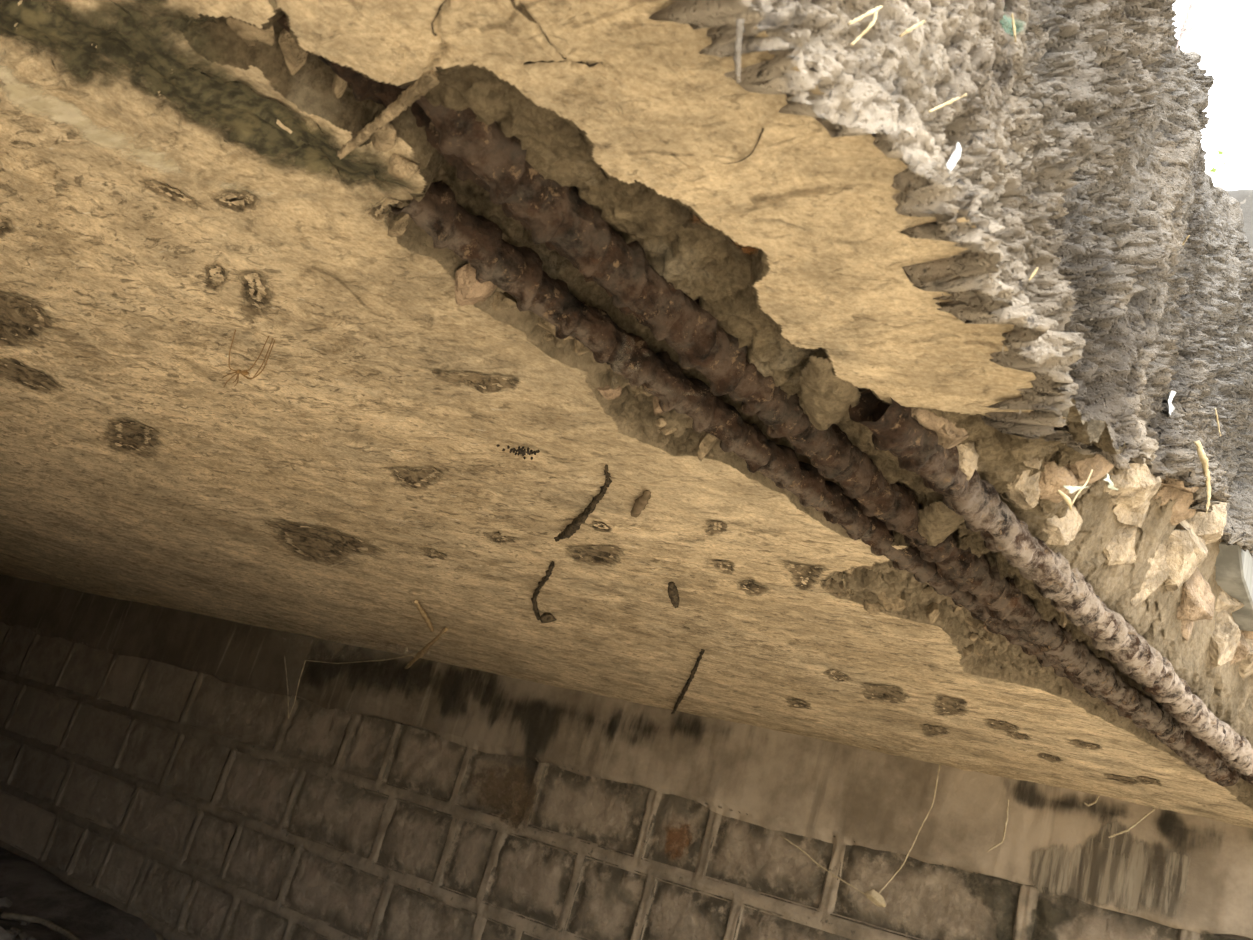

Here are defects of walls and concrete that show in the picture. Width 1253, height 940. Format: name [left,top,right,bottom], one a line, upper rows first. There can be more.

crack [269,0,277,13]
crack [431,0,447,36]
crack [510,0,608,67]
spalling [145,180,197,209]
spalling [183,8,1253,811]
spalling [104,418,163,458]
leakage [301,643,565,828]
leakage [607,712,621,739]
leakage [1015,780,1194,918]